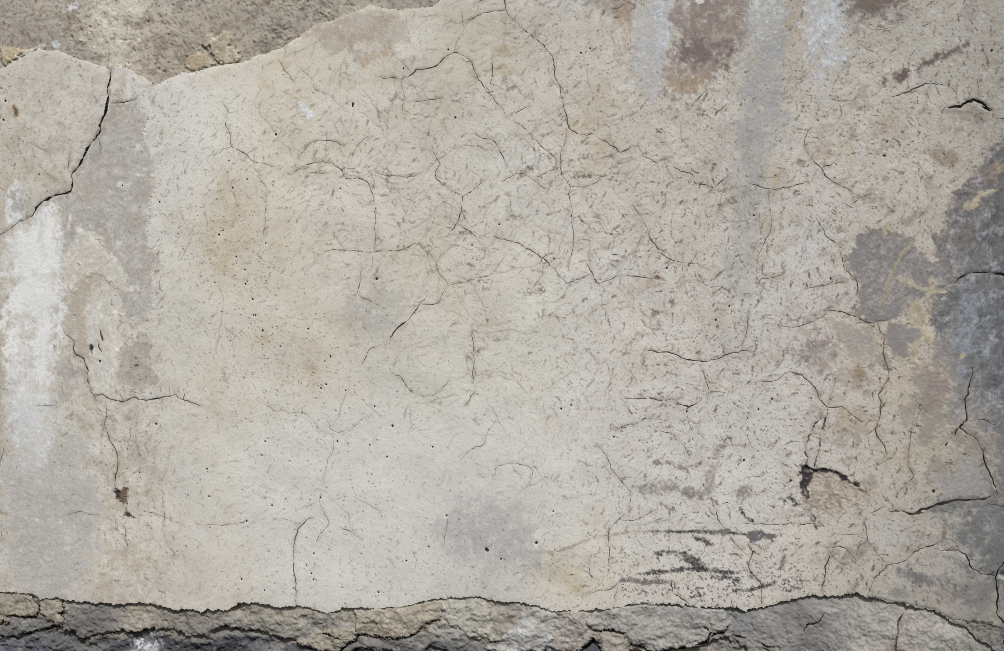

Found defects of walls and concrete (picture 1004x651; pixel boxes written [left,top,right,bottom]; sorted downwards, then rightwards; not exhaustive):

crack [0,69,131,235]
crack [215,0,733,362]
water stain [610,0,676,111]
water stain [711,0,857,327]
crack [893,48,1004,119]
peeling [825,131,1004,507]
crack [62,326,200,486]
flaking render [0,596,544,651]
crack [589,218,1004,644]
spalling [794,462,866,518]
flaking render [660,592,1004,651]
water stain [891,454,1004,628]